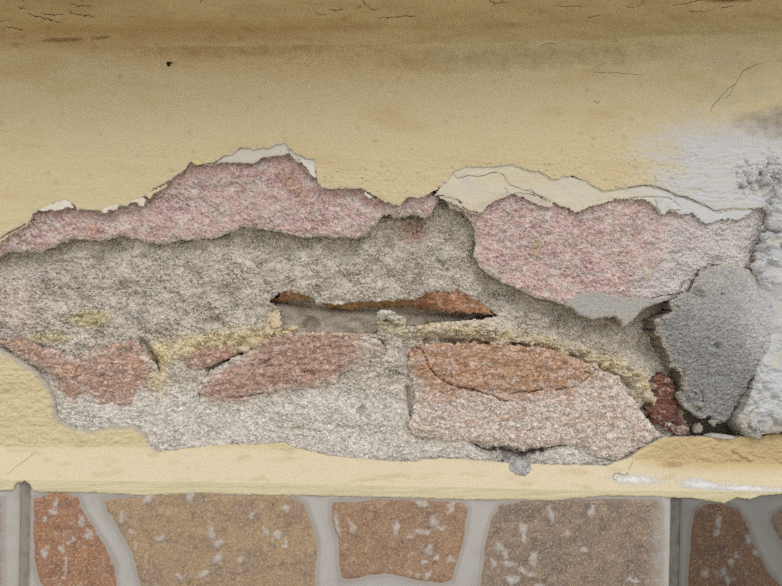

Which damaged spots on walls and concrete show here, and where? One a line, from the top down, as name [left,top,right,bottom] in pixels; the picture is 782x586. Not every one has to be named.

flaking render [0,143,765,476]